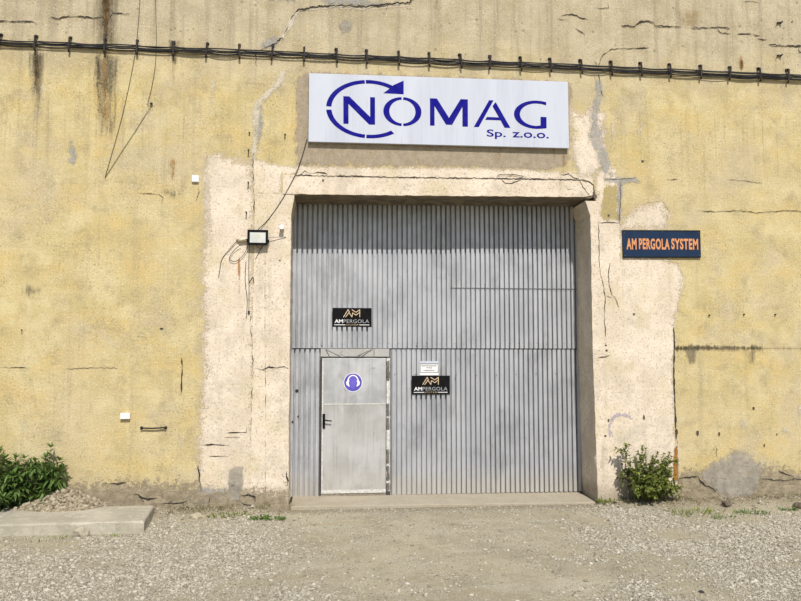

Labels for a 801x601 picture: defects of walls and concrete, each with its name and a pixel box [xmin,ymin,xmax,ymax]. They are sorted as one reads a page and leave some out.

rust [102,0,110,38]
crack [255,0,412,66]
crack [621,20,801,53]
damp [29,51,44,98]
crack [251,71,285,212]
crack [296,47,645,358]
crack [699,207,800,215]
damp [676,345,761,363]